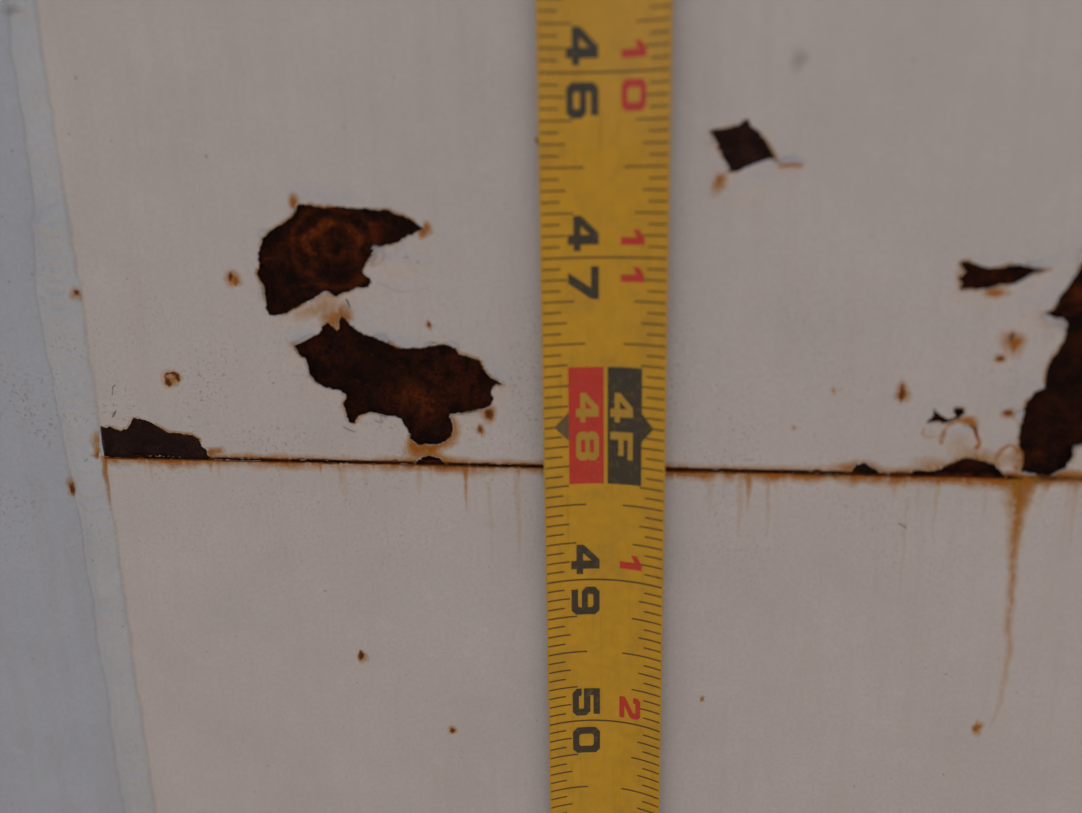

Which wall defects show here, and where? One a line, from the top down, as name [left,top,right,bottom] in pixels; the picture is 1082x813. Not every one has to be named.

rust [165,372,180,386]
rust [478,408,494,434]
rust [94,451,544,490]
rust [665,466,1082,582]